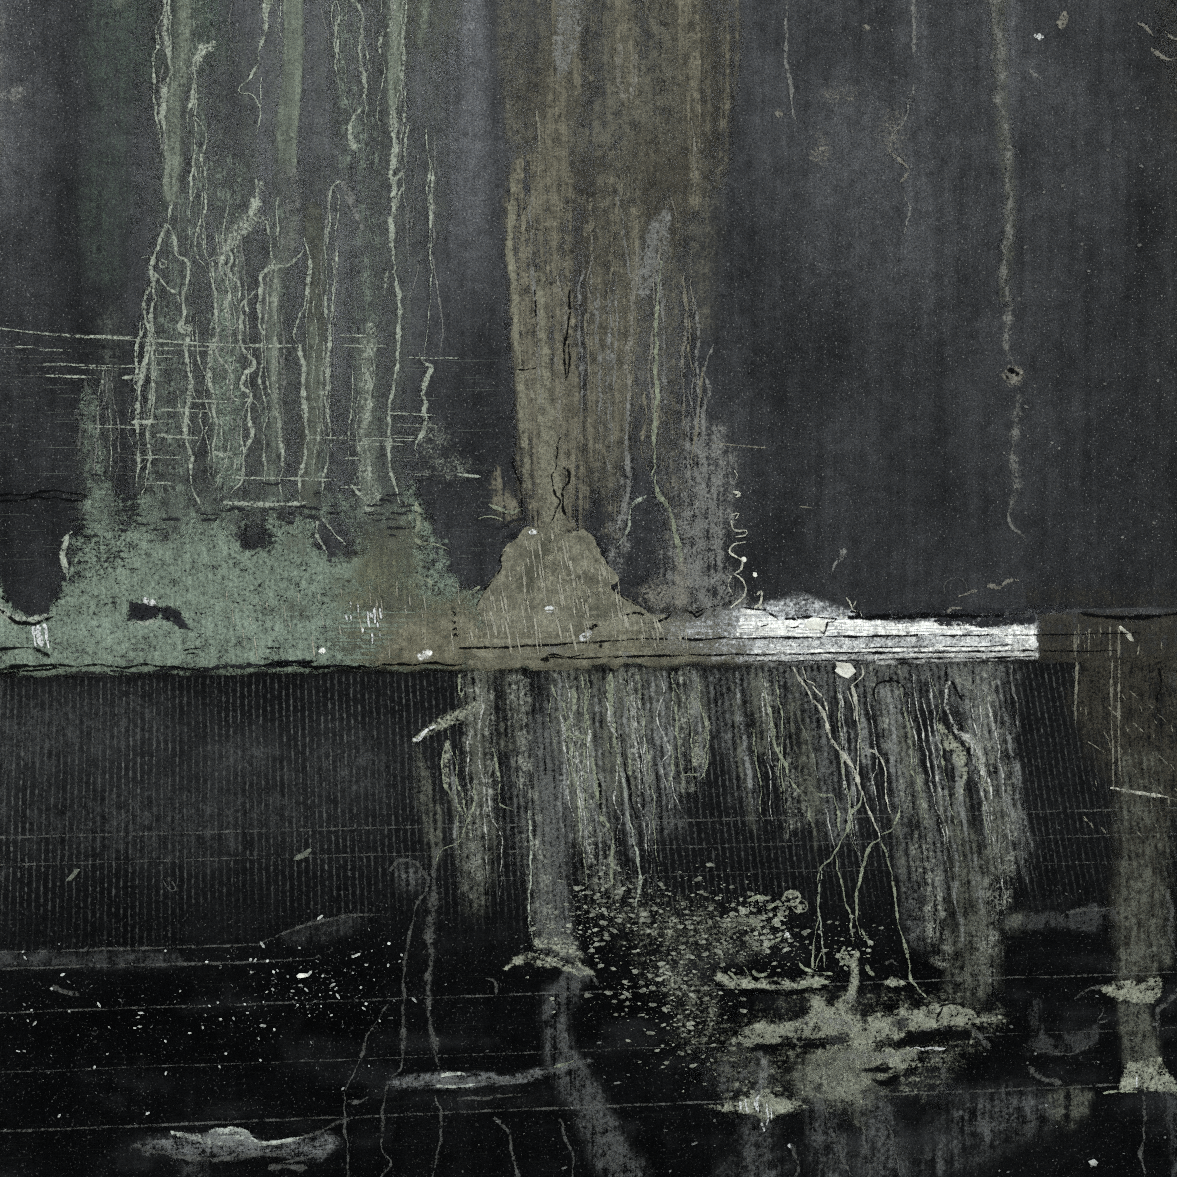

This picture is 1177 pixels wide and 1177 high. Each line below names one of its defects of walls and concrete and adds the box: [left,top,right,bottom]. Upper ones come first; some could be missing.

water stain [775,1,796,120]
water stain [883,84,915,233]
water stain [989,0,1015,359]
water stain [32,624,49,648]
water stain [392,249,1177,1177]